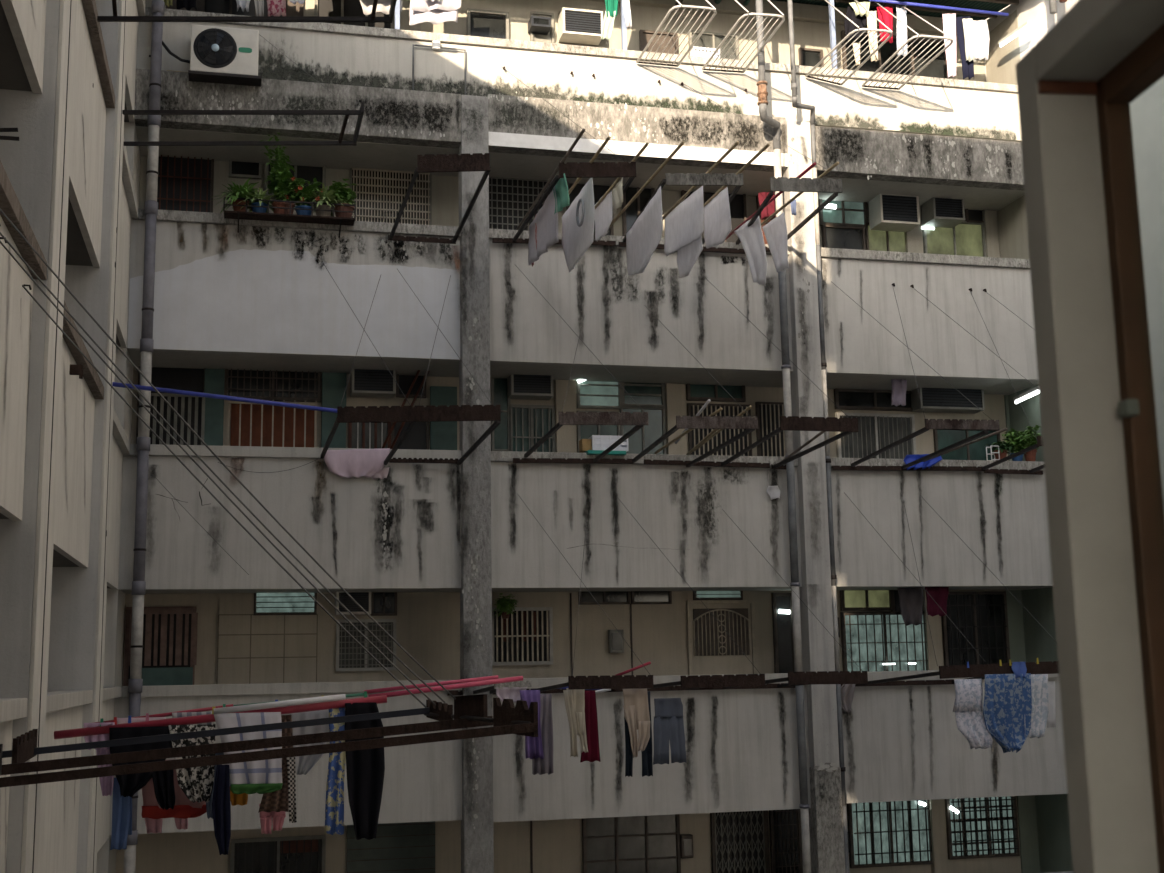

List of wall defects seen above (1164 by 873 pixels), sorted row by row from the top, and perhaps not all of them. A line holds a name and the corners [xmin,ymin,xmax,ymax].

damp [258,48,767,147]
damp [815,113,884,164]
damp [899,123,1016,179]
damp [202,223,364,268]
damp [378,197,475,321]
damp [504,243,515,340]
damp [603,246,679,346]
damp [697,252,706,344]
damp [570,465,591,566]
damp [611,469,619,533]
damp [671,467,741,570]
damp [978,472,1003,569]